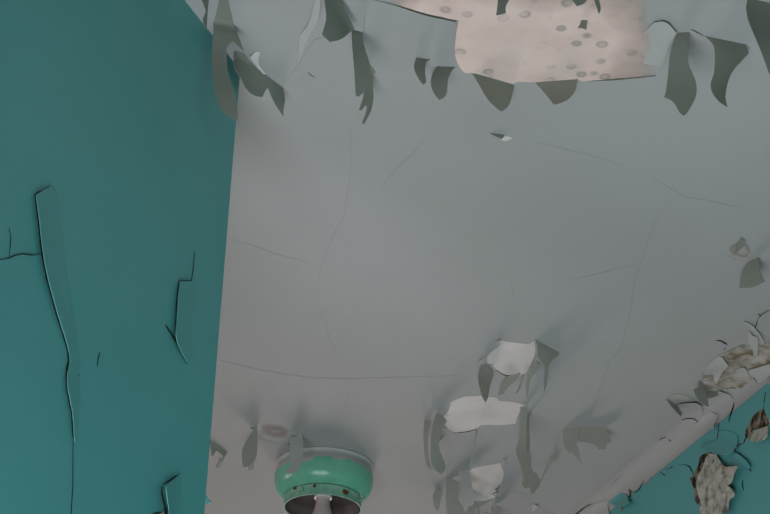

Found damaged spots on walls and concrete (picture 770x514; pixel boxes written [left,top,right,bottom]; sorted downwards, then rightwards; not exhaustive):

peeling [202,0,749,125]
peeling [746,0,770,75]
peeling [724,238,765,288]
peeling [153,474,182,514]
peeling [210,442,227,471]
peeling [242,422,303,474]
peeling [423,339,611,514]
peeling [666,306,770,514]